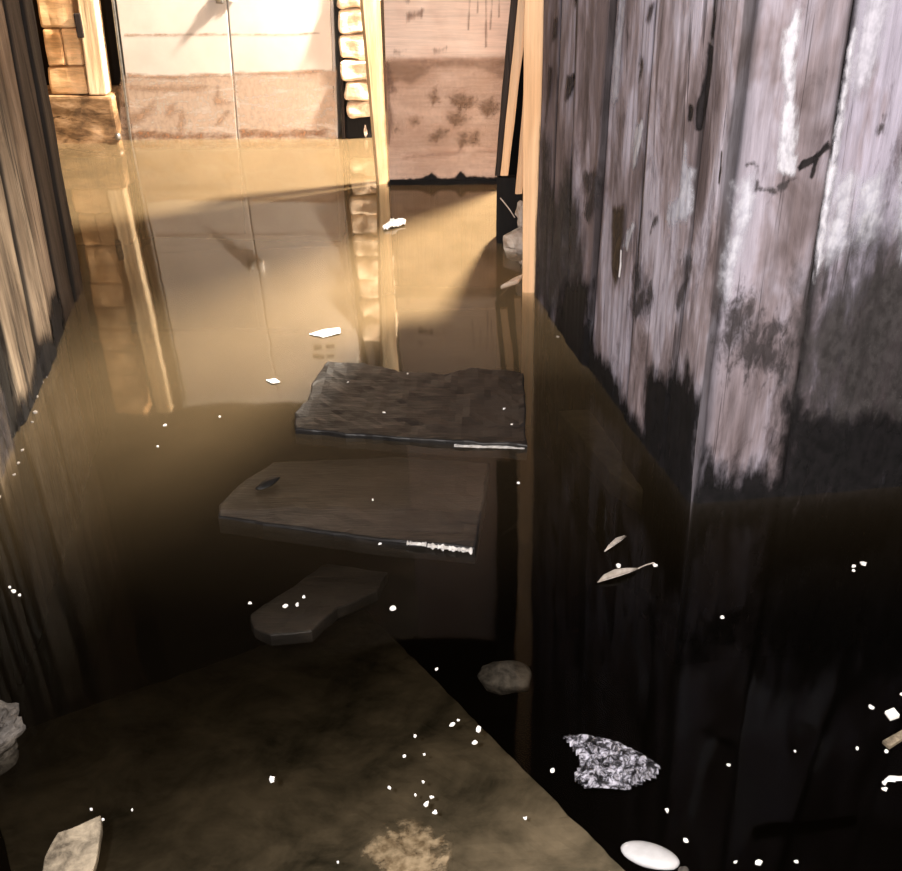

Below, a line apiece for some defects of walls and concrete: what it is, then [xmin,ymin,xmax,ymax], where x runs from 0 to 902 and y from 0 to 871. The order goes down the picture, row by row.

water stain [128,73,183,90]
water stain [565,76,574,101]
water stain [433,96,472,139]
water stain [633,121,643,169]
peeling [816,29,856,270]
water stain [534,141,902,659]